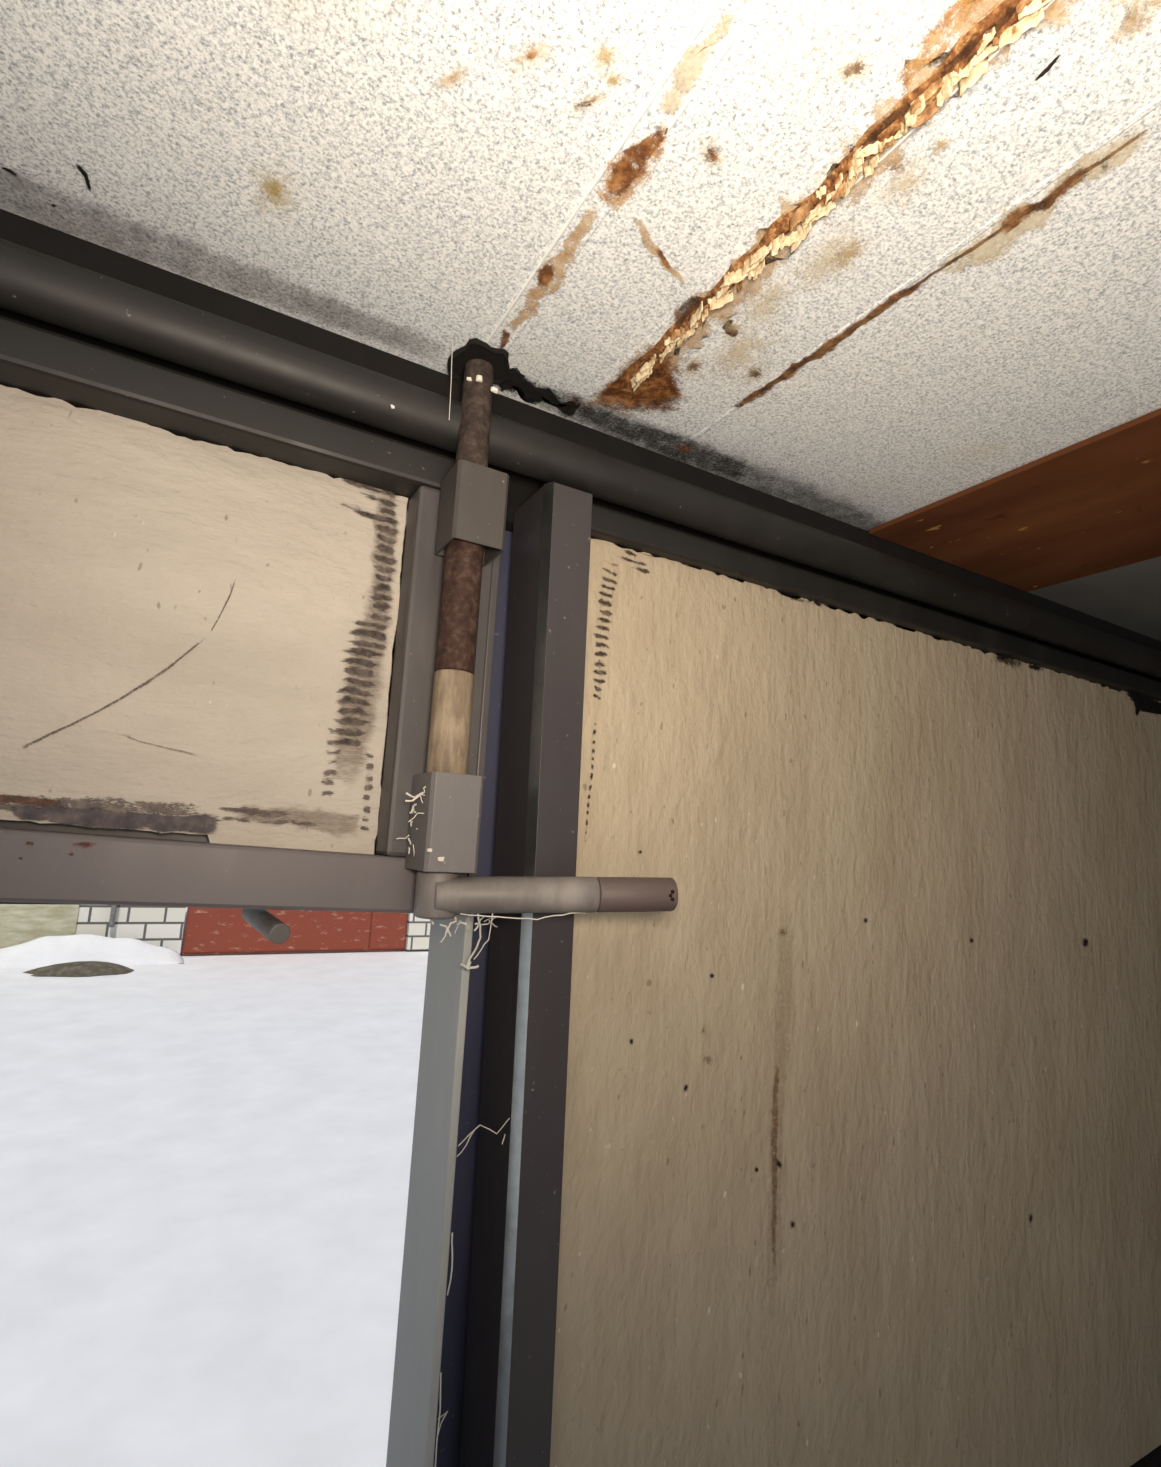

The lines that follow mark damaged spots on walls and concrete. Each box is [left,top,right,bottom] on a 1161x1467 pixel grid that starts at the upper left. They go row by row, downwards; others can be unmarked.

rust [500,15,733,349]
rust [573,0,1081,415]
rust [736,130,1148,407]
water stain [771,1074,779,1251]